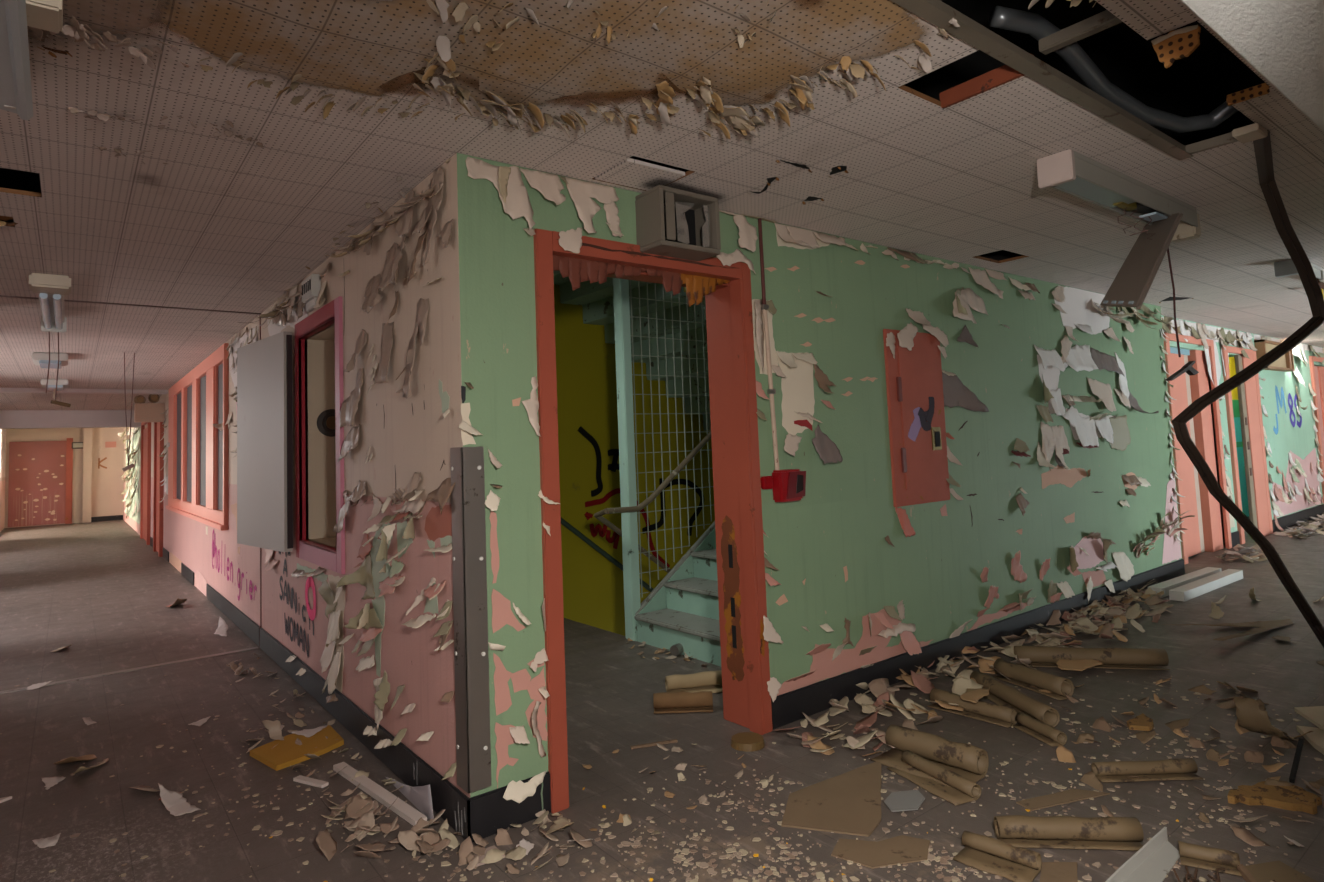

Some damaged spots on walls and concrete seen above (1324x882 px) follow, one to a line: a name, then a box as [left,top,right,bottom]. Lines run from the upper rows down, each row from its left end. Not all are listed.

peeling [29,16,250,73]
water stain [27,0,924,107]
peeling [247,0,886,140]
peeling [895,18,960,74]
peeling [1028,0,1097,10]
spalling [1232,123,1268,143]
peeling [445,157,624,253]
peeling [716,210,1324,756]
peeling [264,549,279,573]
peeling [286,472,455,749]
peeling [439,376,550,803]